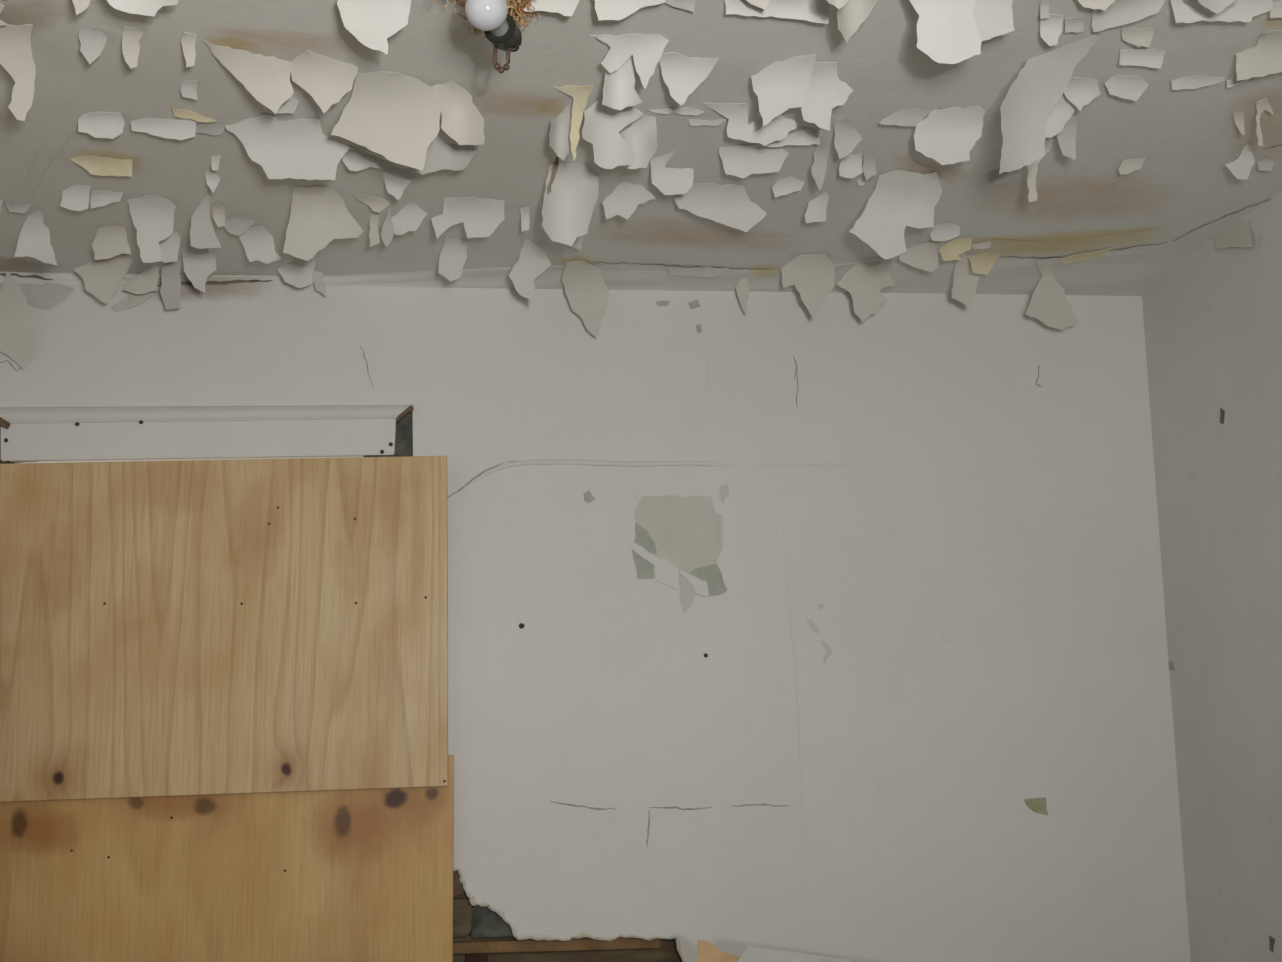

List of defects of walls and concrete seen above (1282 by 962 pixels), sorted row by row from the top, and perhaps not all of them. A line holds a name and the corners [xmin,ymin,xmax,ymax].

peeling [0,4,36,121]
peeling [72,0,178,68]
peeling [337,0,411,55]
peeling [60,32,505,312]
peeling [509,0,1282,338]
peeling [0,199,58,266]
peeling [631,495,727,614]
crack [550,801,617,810]
crack [646,803,790,846]
flaking render [453,865,685,962]